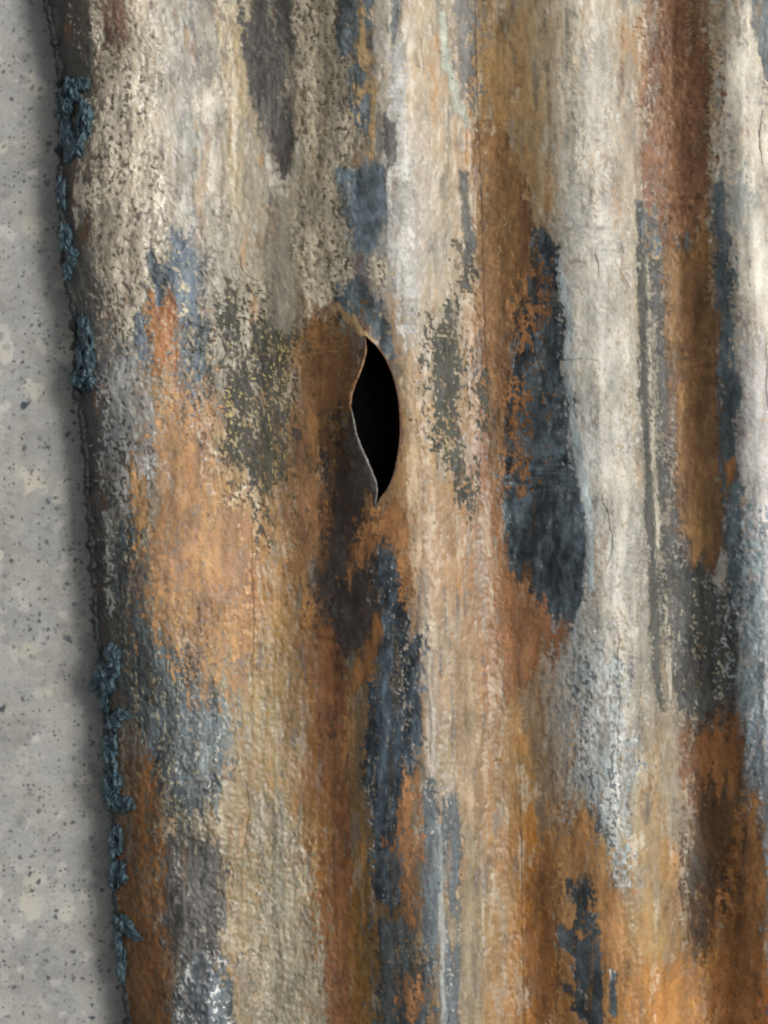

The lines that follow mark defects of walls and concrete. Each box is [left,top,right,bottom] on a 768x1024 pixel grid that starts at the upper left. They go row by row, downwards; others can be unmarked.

rust [121,288,375,722]
rust [470,119,561,514]
rust [495,574,569,701]
rust [633,0,736,576]
rust [118,750,181,1024]
rust [514,702,768,1024]